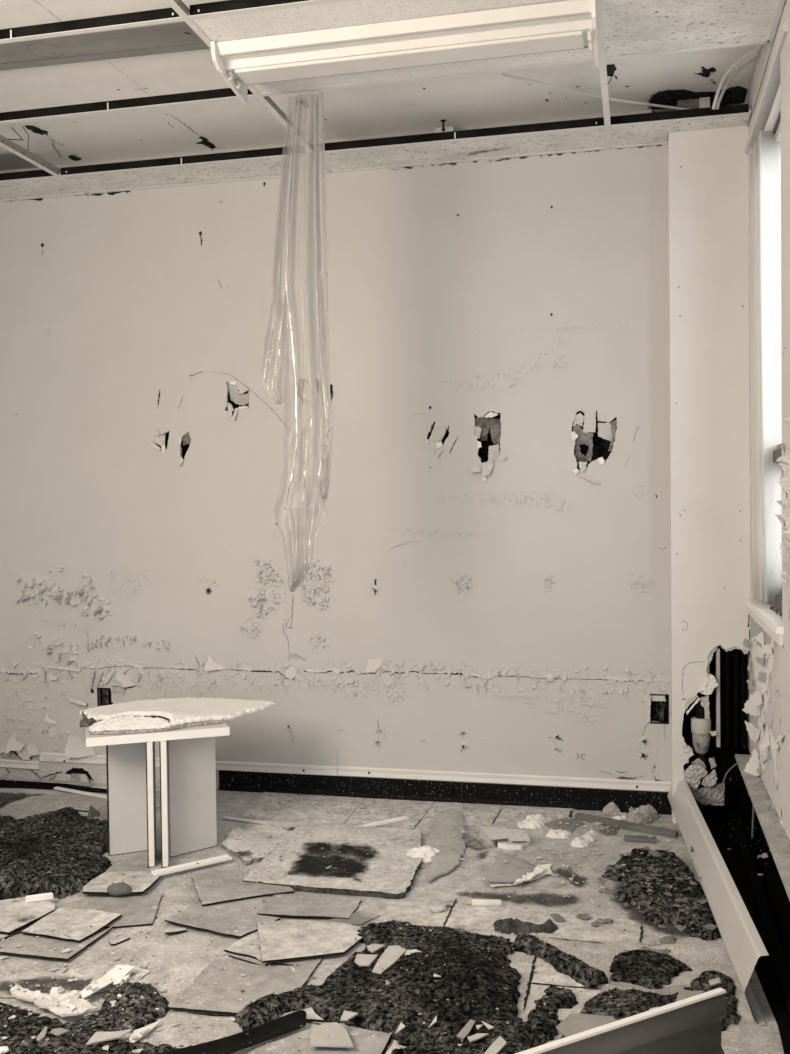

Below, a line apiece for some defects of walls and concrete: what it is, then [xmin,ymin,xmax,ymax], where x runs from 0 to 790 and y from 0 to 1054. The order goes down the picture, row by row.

spalling [226,381,250,420]
spalling [149,430,191,466]
spalling [470,411,506,481]
spalling [571,410,617,485]
peeling [775,404,790,617]
peeling [10,572,114,622]
peeling [237,557,335,641]
peeling [21,631,173,667]
spalling [682,616,790,822]